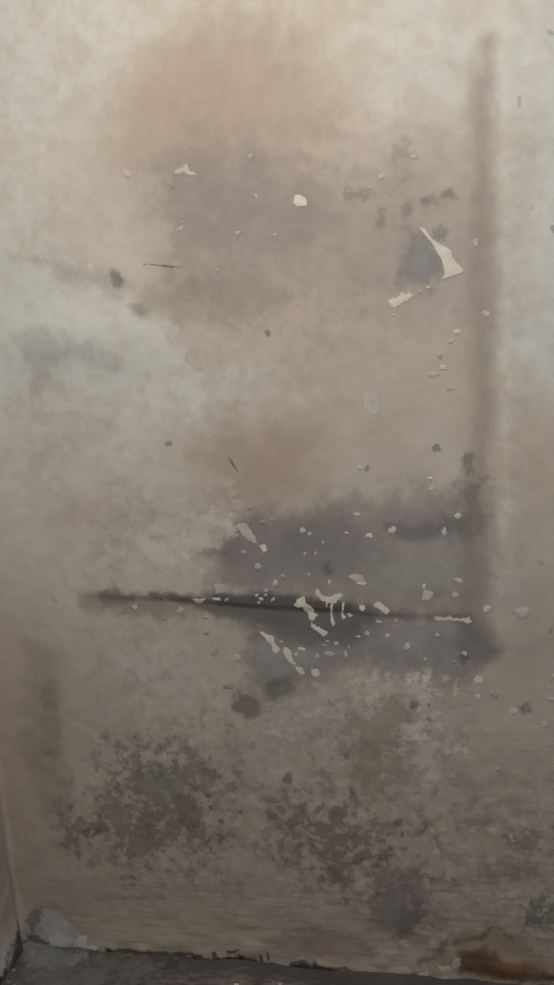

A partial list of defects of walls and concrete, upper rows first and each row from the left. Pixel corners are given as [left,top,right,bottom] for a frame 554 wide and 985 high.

peeling [419,226,464,280]
peeling [388,286,430,316]
peeling [192,584,229,603]
crack [85,589,373,639]
damp [56,736,242,871]
damp [266,701,437,937]
rust [438,930,554,982]